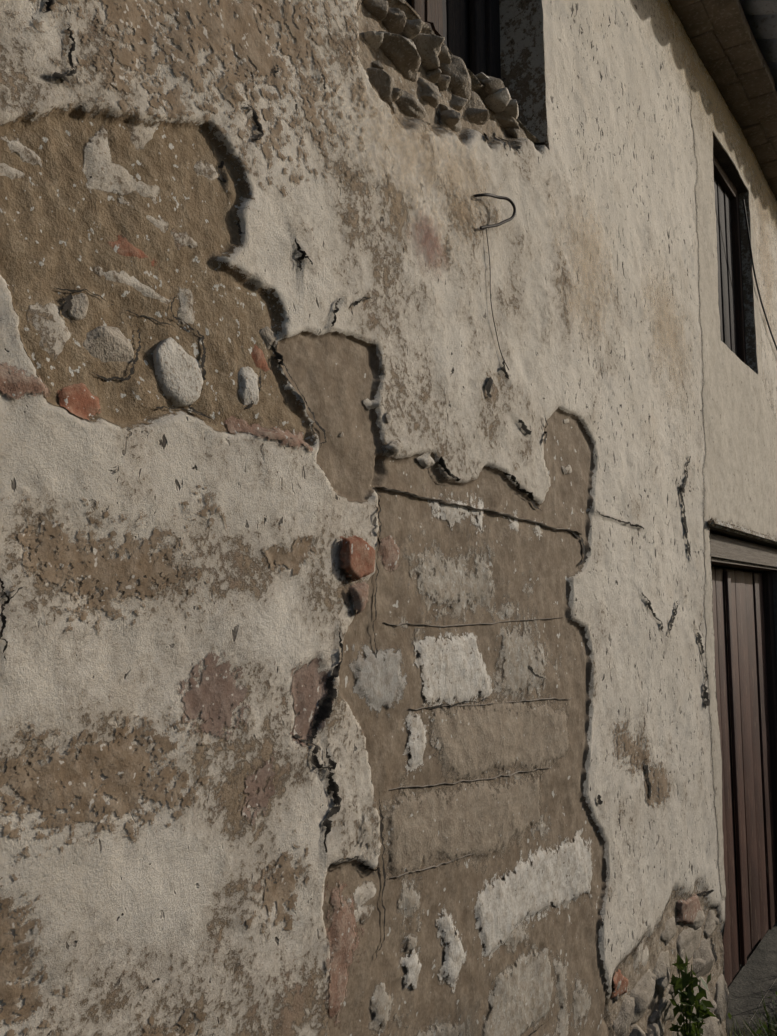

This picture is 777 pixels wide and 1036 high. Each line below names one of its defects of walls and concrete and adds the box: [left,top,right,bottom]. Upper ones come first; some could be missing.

crack [43,0,77,83]
spalling [0,0,544,452]
crack [0,578,24,659]
peeling [1,473,228,649]
crack [642,593,679,634]
crack [679,456,691,556]
crack [697,632,710,709]
crack [294,633,343,853]
peeling [0,645,258,1036]
peeling [369,922,422,1034]
peeling [435,906,467,992]
spalling [603,877,729,1036]